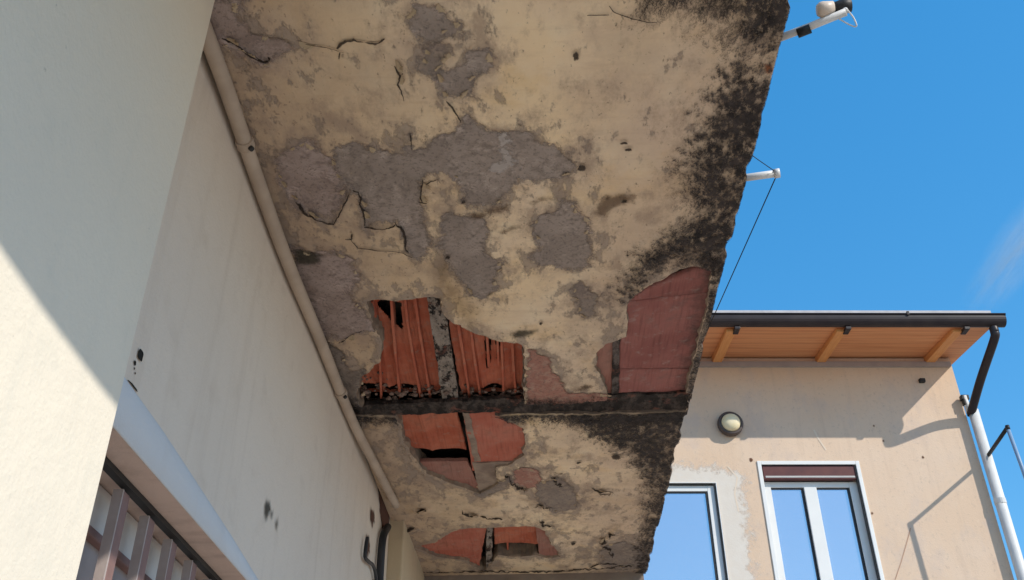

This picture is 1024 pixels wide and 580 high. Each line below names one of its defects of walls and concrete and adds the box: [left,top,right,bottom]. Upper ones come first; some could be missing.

crack [222,38,271,63]
peeling [406,3,496,99]
crack [295,190,412,258]
peeling [273,114,585,299]
peeling [527,199,599,318]
water stain [495,0,790,574]
water stain [351,398,399,427]
spalling [289,245,712,514]
spalling [416,526,560,570]